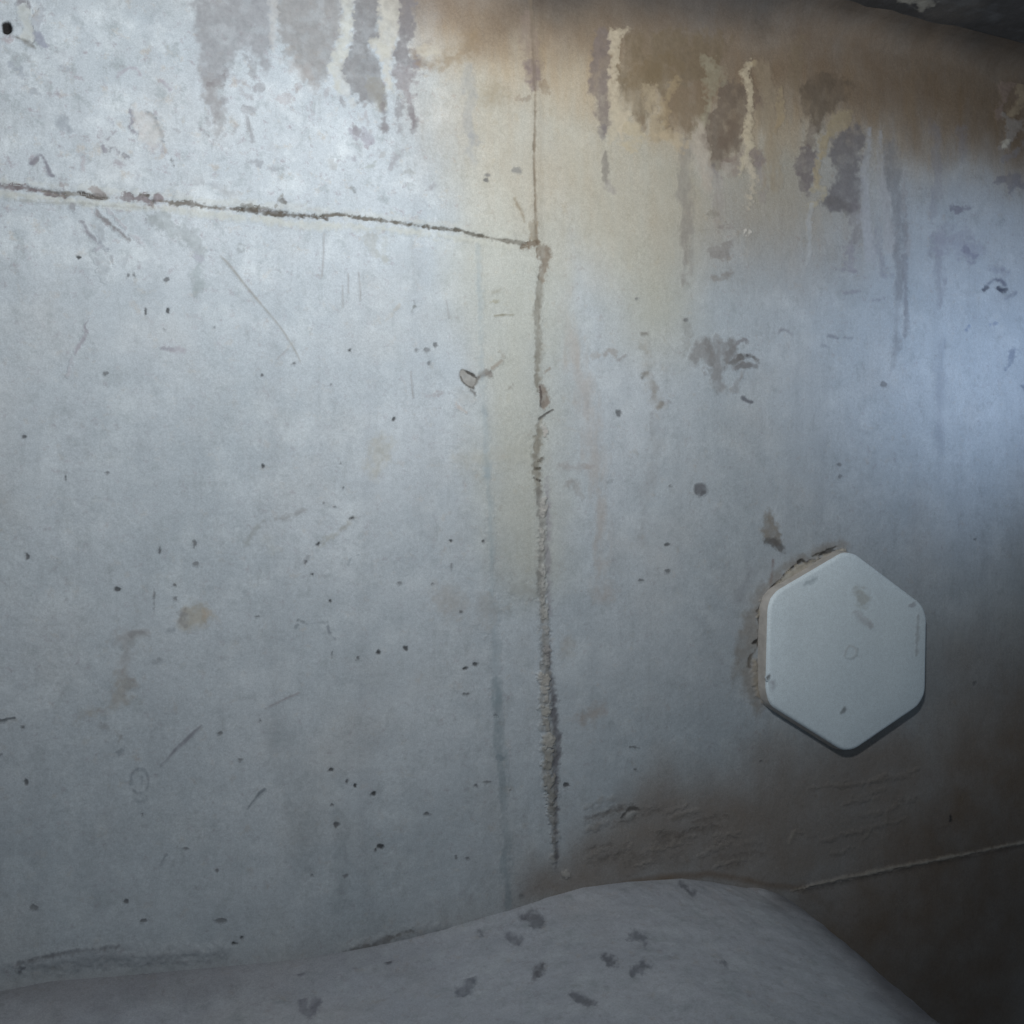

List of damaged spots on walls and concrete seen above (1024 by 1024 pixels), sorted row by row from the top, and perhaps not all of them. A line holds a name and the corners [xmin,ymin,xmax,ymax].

crack [0,0,571,880]
leakage [173,0,448,187]
leakage [675,314,762,405]
leakage [584,21,989,374]